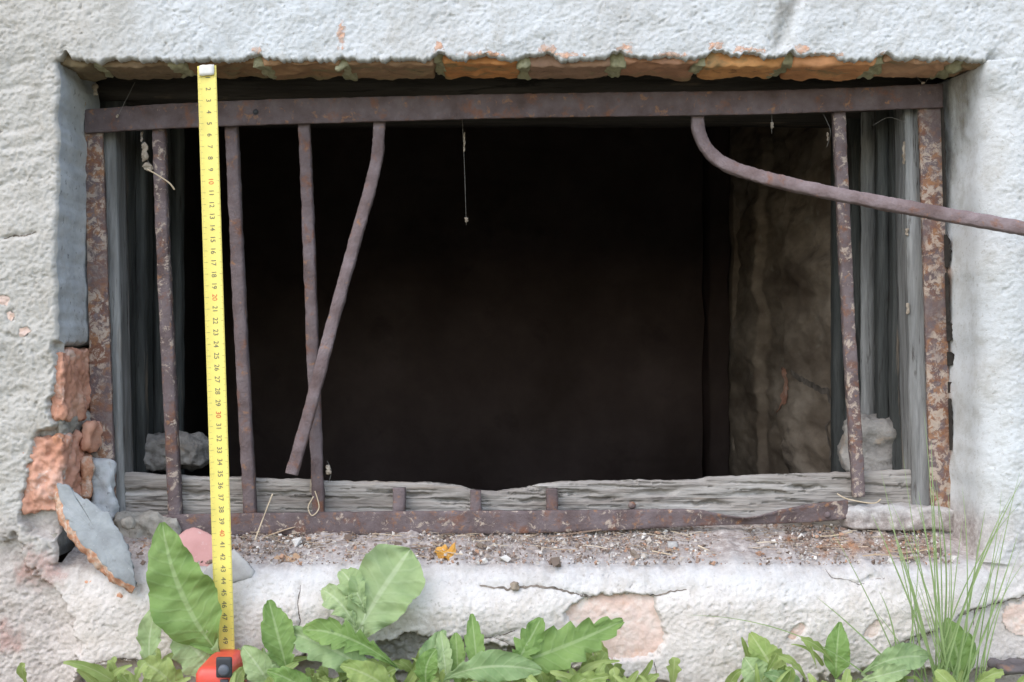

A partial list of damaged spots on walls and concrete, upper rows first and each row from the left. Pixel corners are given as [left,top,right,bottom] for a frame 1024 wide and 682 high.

flaking render [708,42,765,53]
crack [480,585,592,598]
spalling [566,593,664,660]